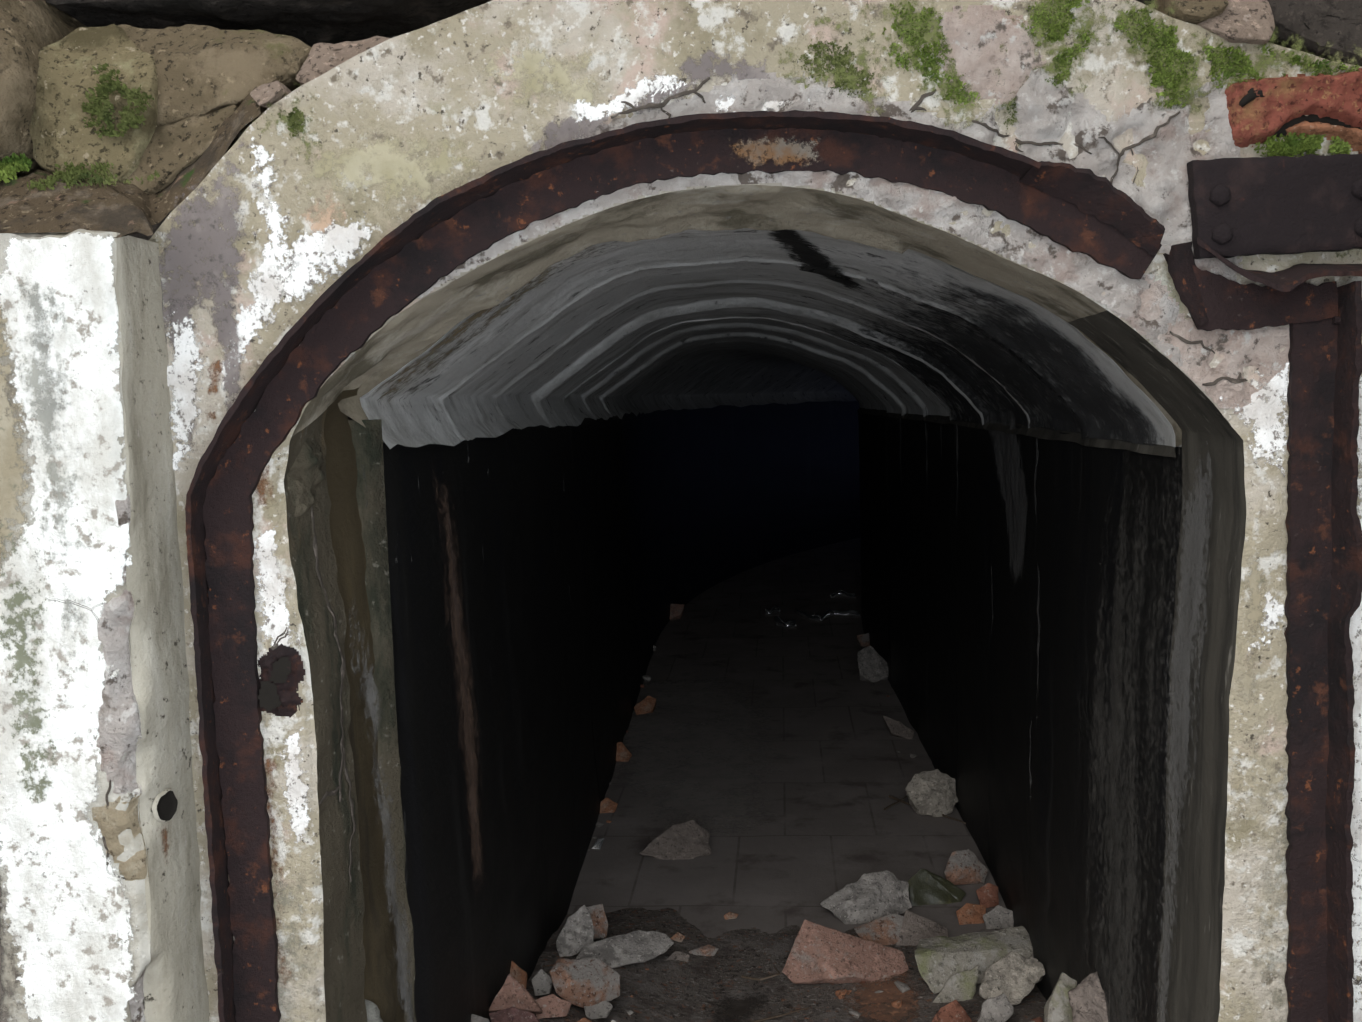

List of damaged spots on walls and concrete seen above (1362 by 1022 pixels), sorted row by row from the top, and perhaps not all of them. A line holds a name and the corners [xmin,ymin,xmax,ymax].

crack [972,111,1180,184]
leakage [158,137,373,470]
rust [208,360,222,393]
leakage [62,599,91,628]
leakage [1349,599,1362,1022]
leakage [0,887,20,1022]